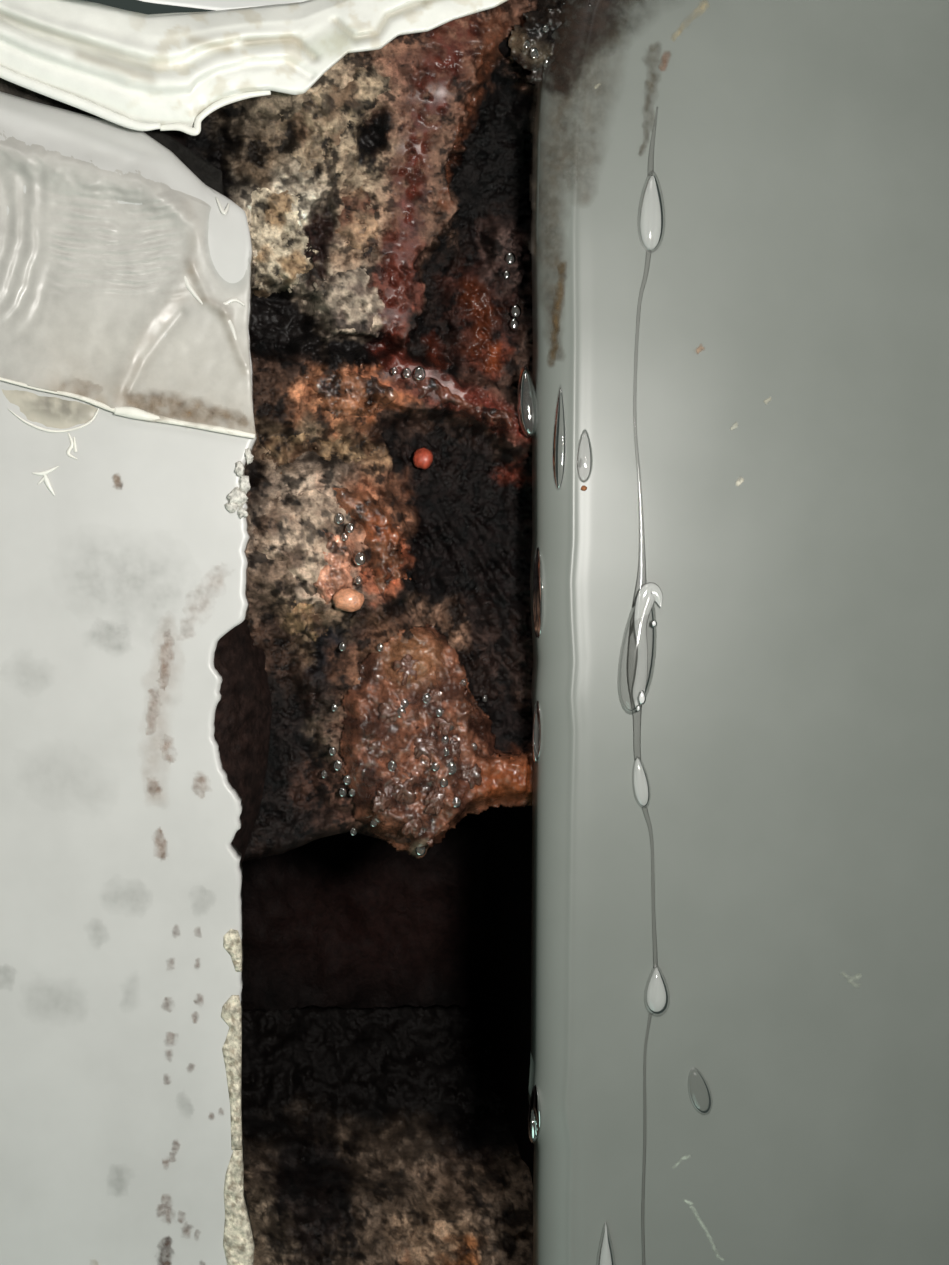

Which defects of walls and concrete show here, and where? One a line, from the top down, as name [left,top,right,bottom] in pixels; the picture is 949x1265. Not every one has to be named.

leakage [543,0,641,129]
corrosion [373,17,532,441]
leakage [550,257,564,364]
spalling [0,0,546,865]
spalling [223,929,243,972]
spalling [221,995,255,1265]
corrosion [160,1237,171,1265]